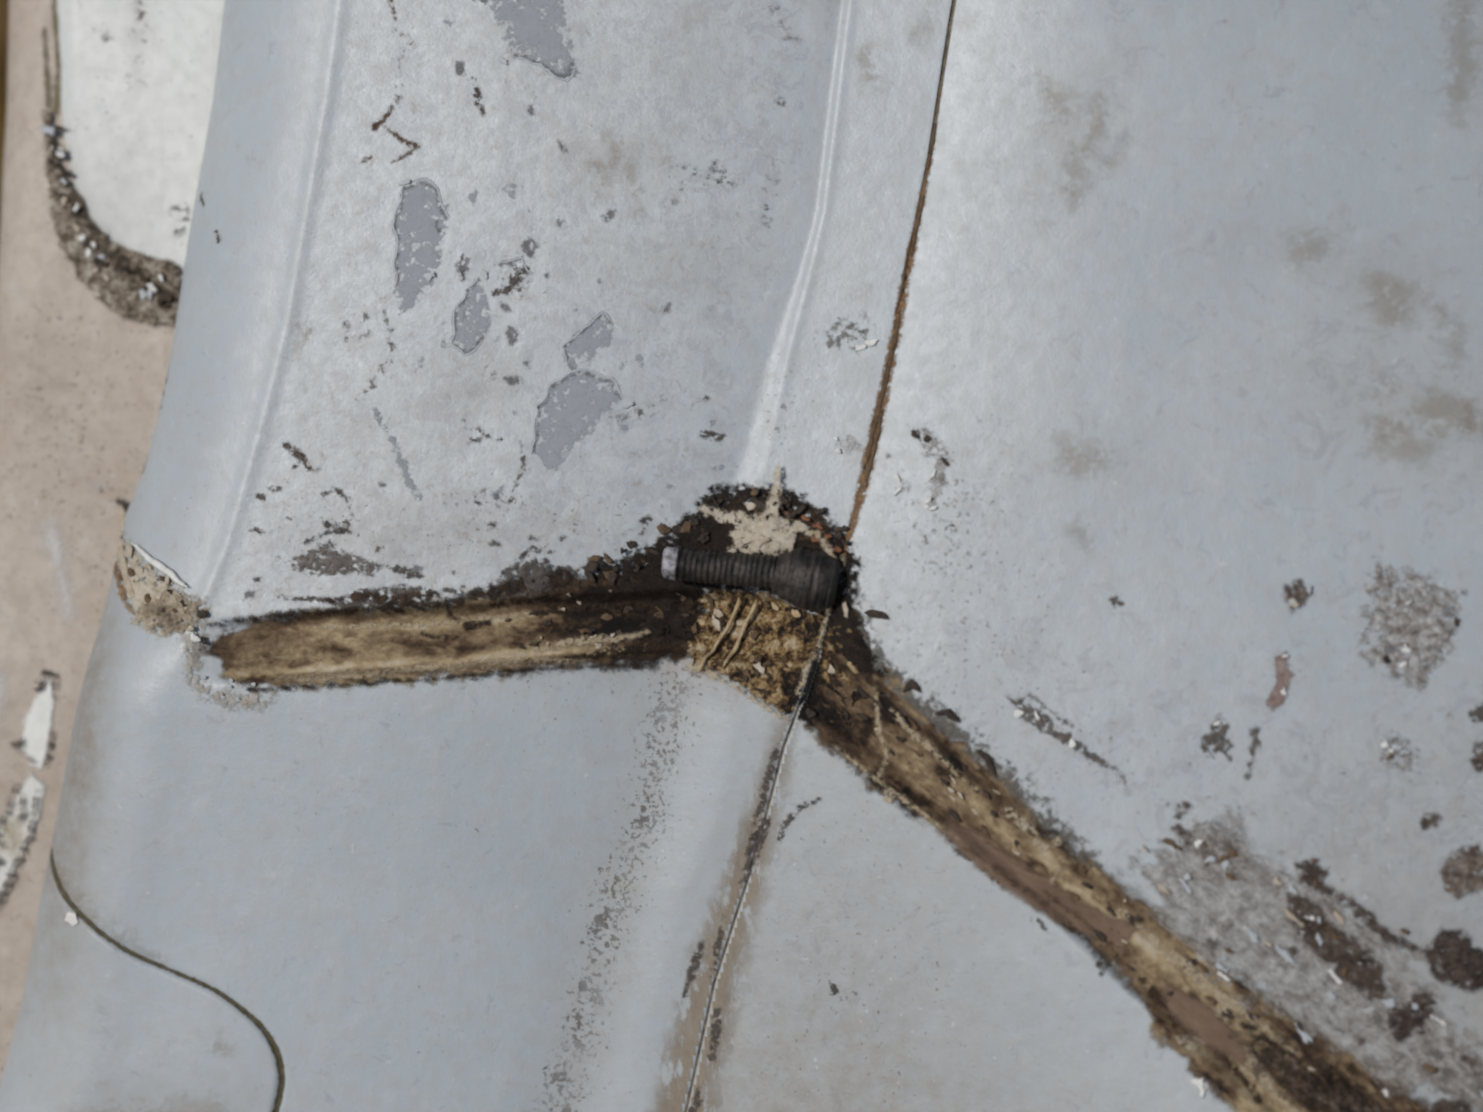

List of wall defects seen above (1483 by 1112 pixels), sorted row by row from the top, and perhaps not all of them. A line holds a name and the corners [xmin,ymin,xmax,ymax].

peeling [481,0,579,82]
peeling [391,177,548,384]
peeling [531,309,644,470]
peeling [117,504,207,645]
corrosion [199,93,1483,1112]
peeling [1265,653,1293,711]
peeling [1283,579,1312,611]
peeling [1358,565,1466,692]
peeling [0,669,56,904]
peeling [1201,718,1261,779]
peeling [1295,858,1328,887]
peeling [1441,845,1483,899]